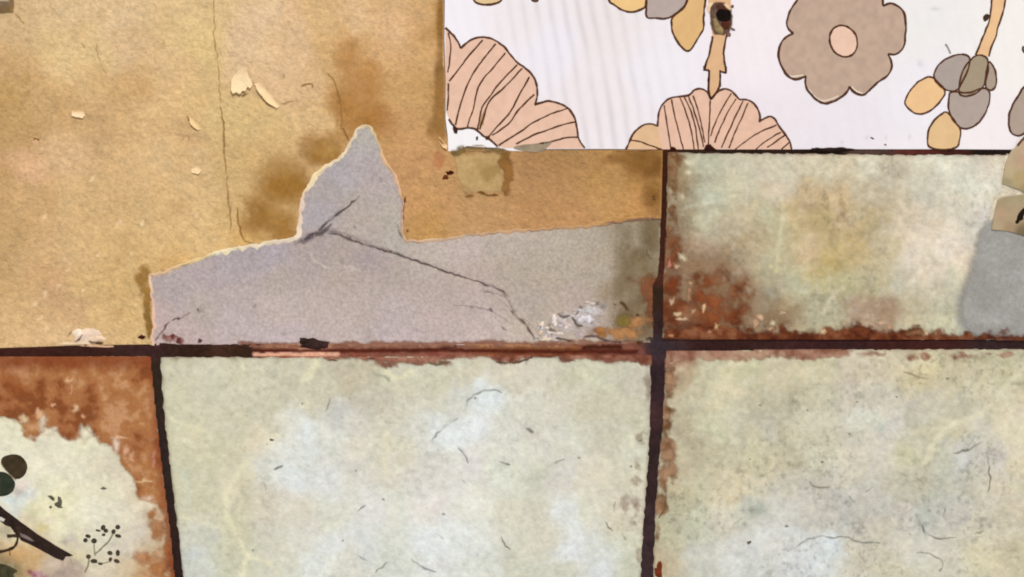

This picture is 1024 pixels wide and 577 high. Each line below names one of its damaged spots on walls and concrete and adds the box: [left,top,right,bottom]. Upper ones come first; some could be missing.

crack [213,0,260,244]
peeling [231,67,280,108]
leakage [246,162,307,239]
leakage [308,138,340,164]
leakage [344,60,377,126]
peeling [149,124,661,345]
crack [299,197,534,337]
rust [324,153,1024,514]
rust [0,356,175,577]